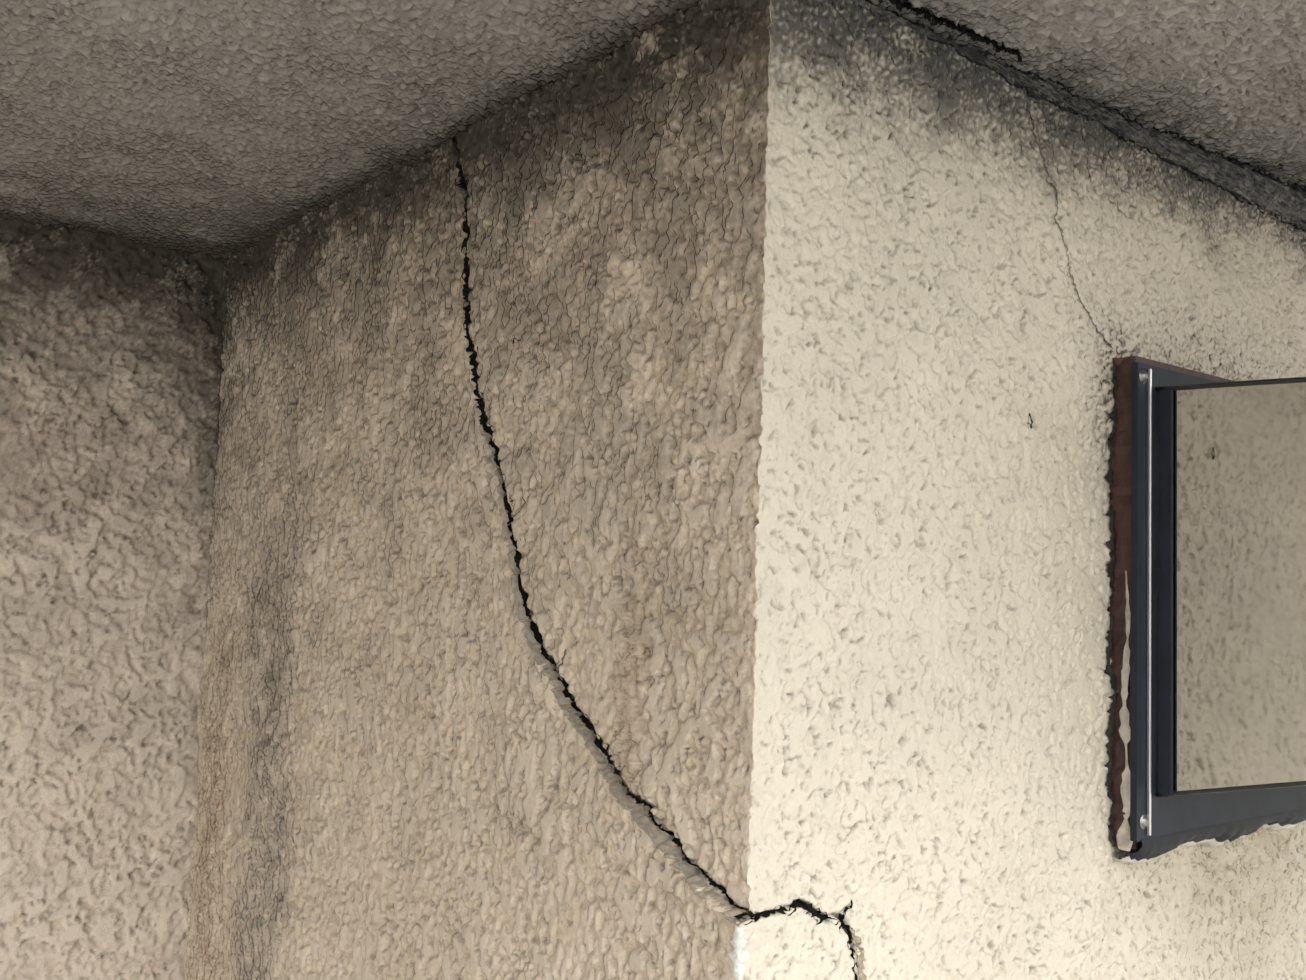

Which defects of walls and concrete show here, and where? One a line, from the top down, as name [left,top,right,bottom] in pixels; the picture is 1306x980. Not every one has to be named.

damp [0,0,1306,485]
crack [879,0,1022,62]
crack [1027,109,1113,349]
crack [452,138,867,980]